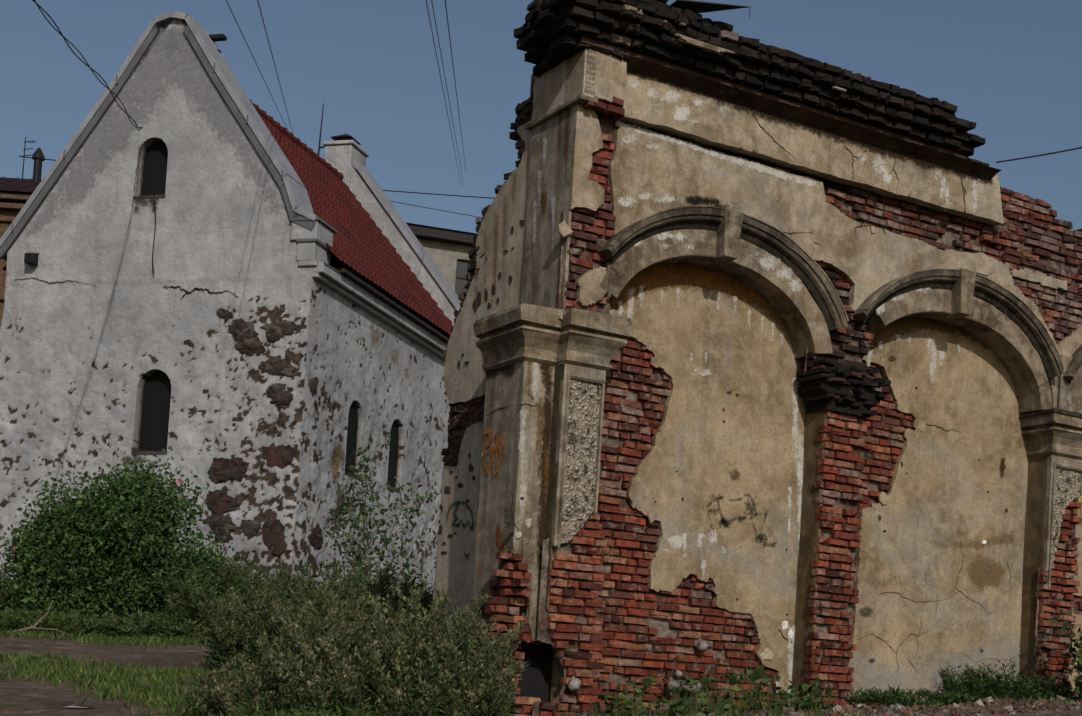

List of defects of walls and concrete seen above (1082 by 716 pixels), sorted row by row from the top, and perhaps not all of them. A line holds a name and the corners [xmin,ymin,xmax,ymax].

crack [15,277,94,286]
crack [163,285,238,299]
flaking render [557,111,624,320]
flaking render [810,175,1082,344]
flaking render [216,308,297,406]
flaking render [202,457,287,556]
flaking render [262,442,295,469]
flaking render [467,338,784,716]
flaking render [804,261,926,706]
flaking render [782,613,793,640]
crack [860,555,1011,680]
flaking render [1031,497,1082,689]